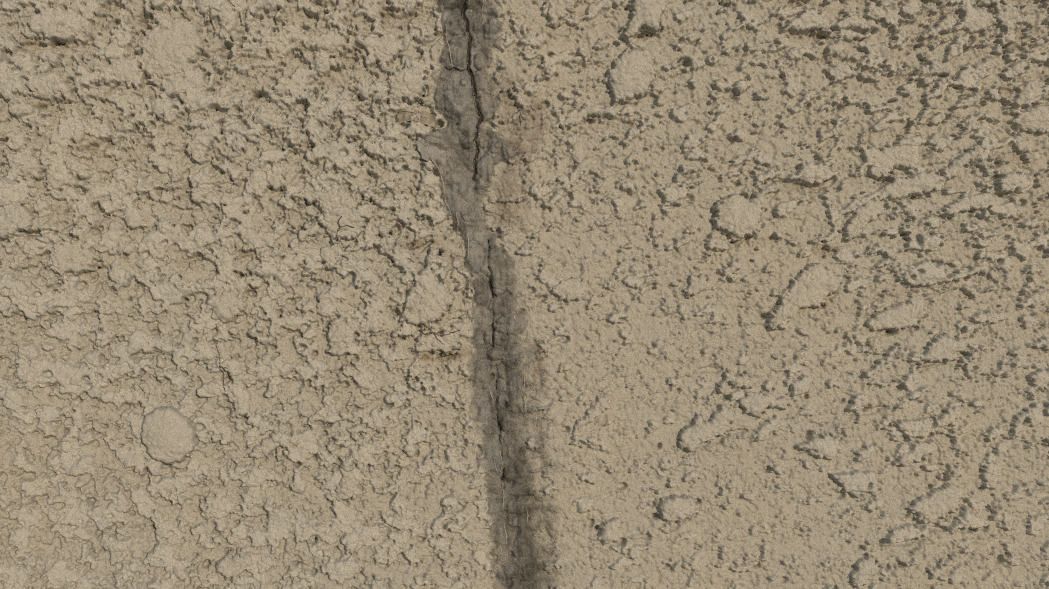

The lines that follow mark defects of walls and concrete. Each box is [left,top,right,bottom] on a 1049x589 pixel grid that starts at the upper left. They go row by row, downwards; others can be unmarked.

crack [445,0,492,179]